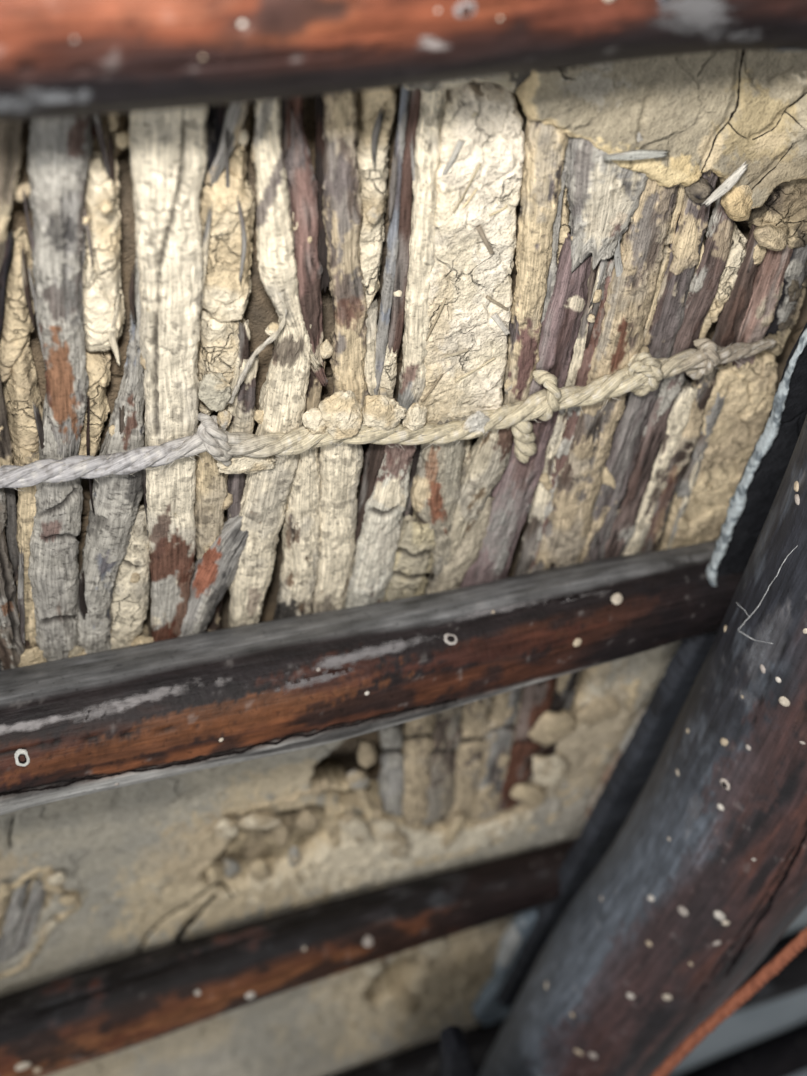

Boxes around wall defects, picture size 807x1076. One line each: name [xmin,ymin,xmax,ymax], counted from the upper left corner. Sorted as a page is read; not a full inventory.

crack [701,50,807,190]
flaking render [194,679,646,900]
flaking render [0,866,83,977]
crack [138,883,233,952]
crack [727,832,807,974]